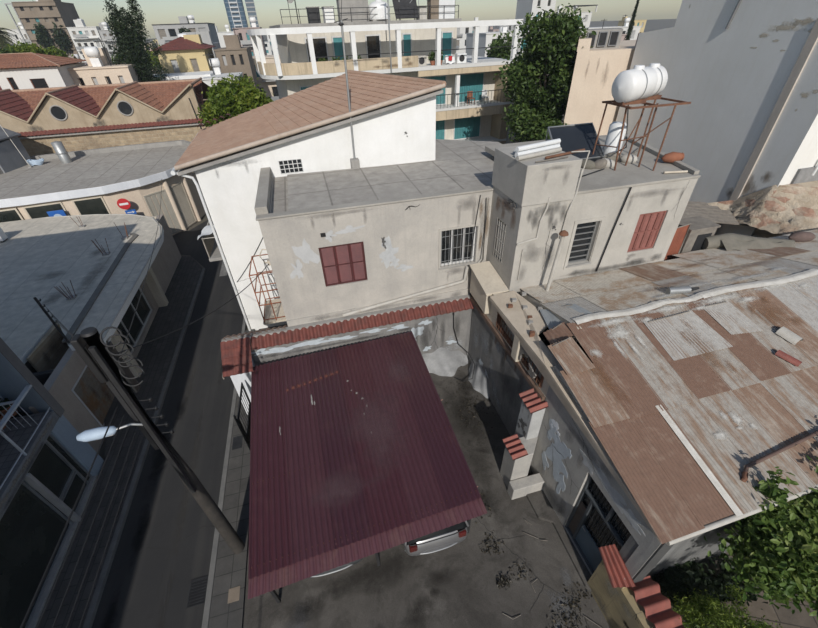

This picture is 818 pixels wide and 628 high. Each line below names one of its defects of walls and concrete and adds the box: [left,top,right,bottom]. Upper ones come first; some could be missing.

peeling [290,239,320,279]
peeling [542,419,645,536]